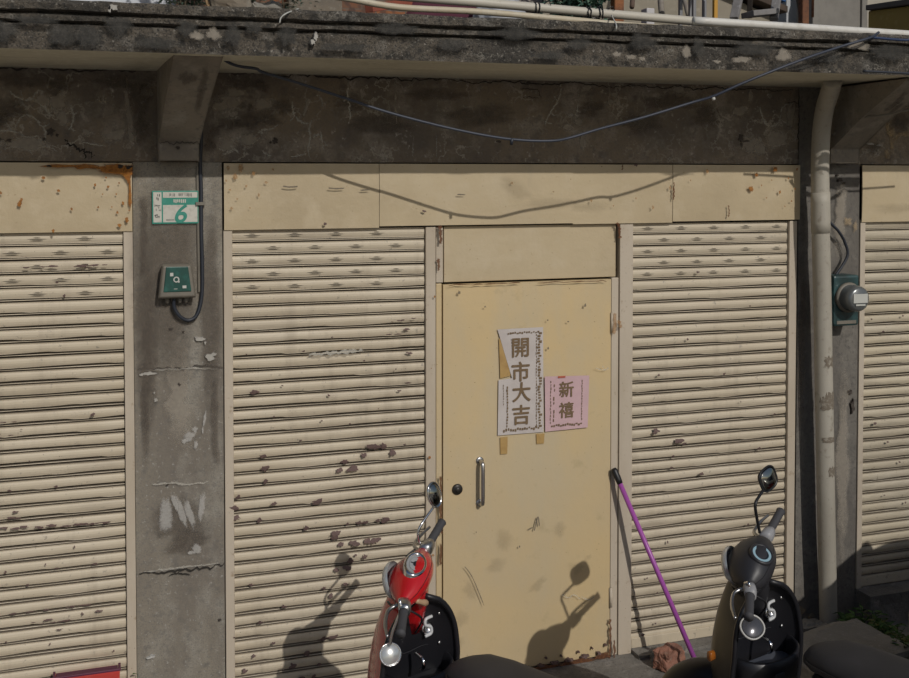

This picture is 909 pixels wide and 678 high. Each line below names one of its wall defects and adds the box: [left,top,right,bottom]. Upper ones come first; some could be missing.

crack [231,73,800,159]
crack [64,139,93,158]
rust [41,163,133,227]
peeling [182,413,206,448]
peeling [160,496,205,529]
crack [139,562,225,576]
rust [534,619,616,670]